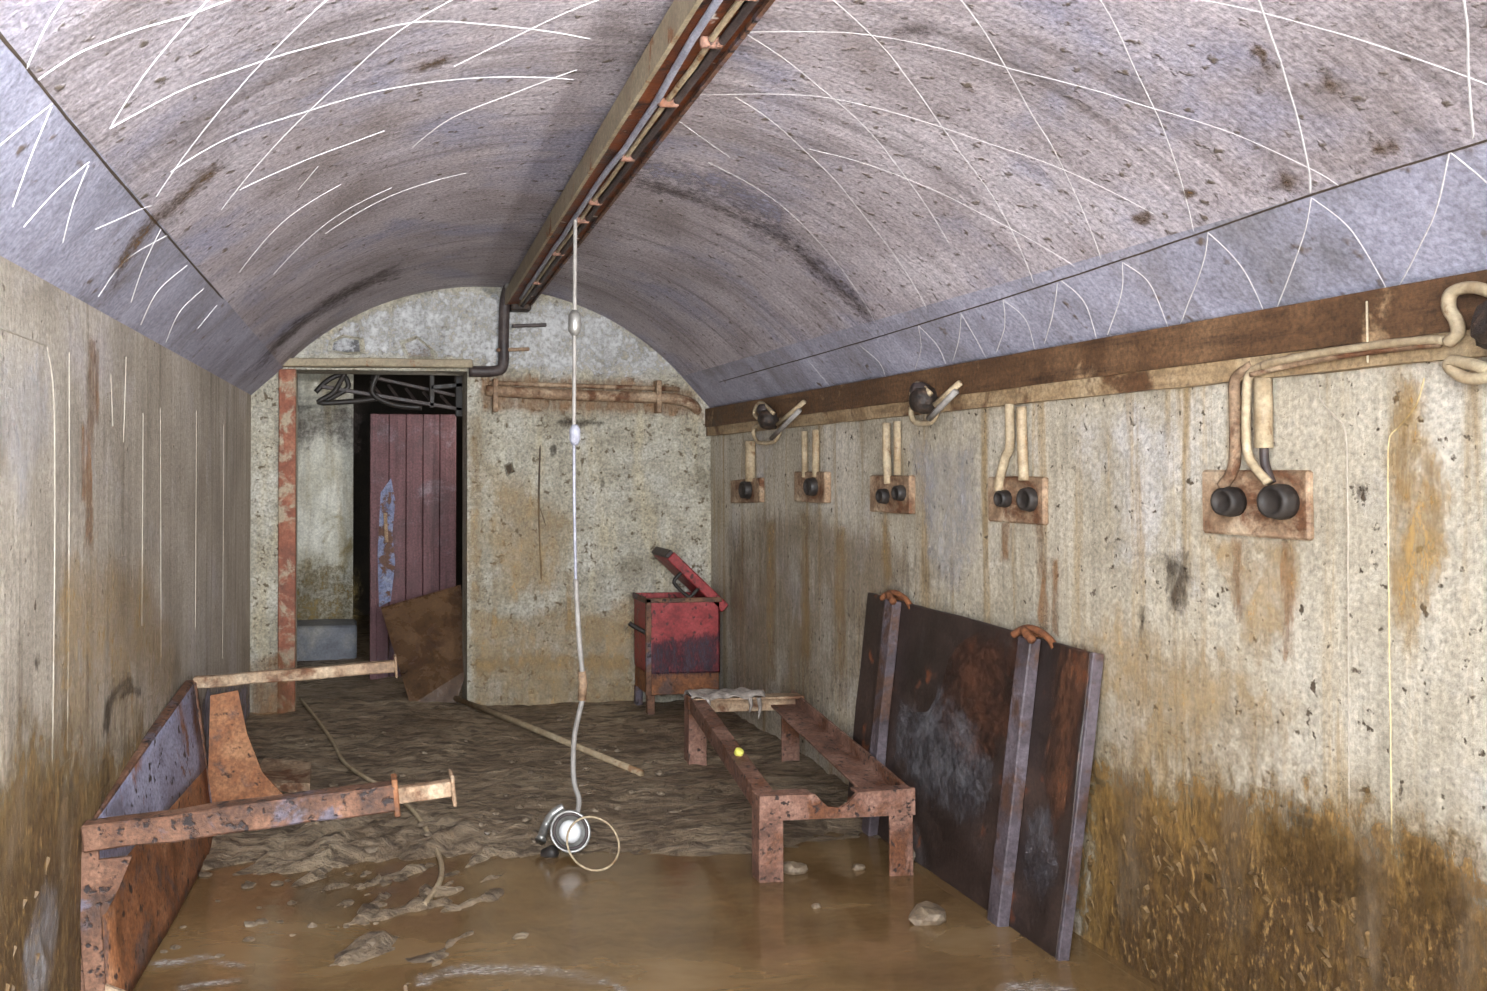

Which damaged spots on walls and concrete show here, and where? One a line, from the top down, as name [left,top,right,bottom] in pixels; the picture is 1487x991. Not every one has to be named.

leakage [82,348,99,536]
leakage [0,675,158,991]
leakage [1073,744,1487,991]